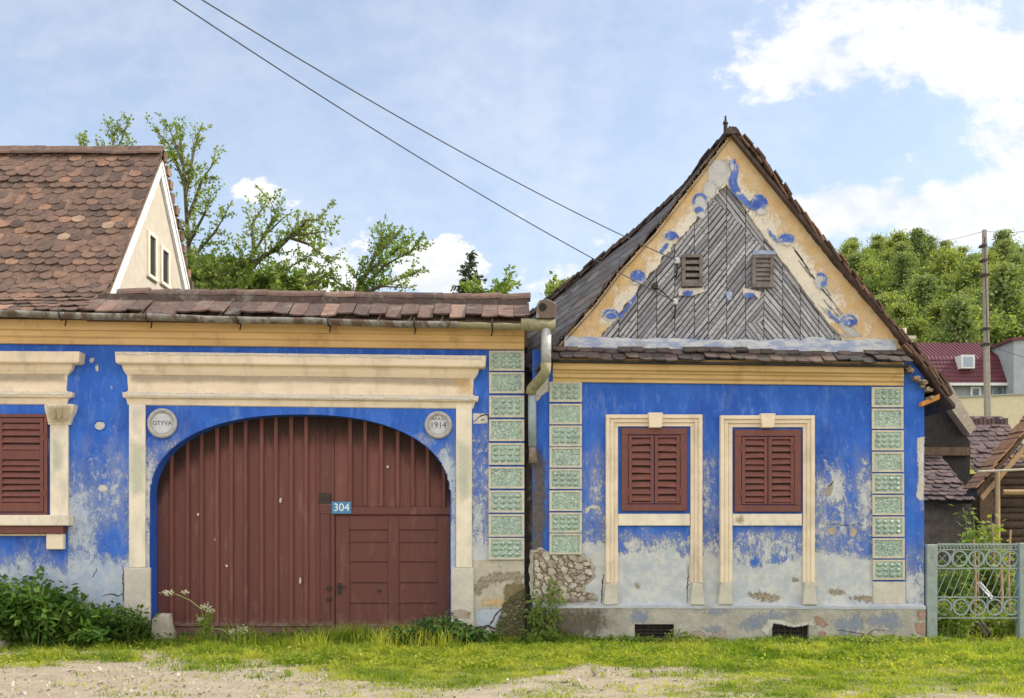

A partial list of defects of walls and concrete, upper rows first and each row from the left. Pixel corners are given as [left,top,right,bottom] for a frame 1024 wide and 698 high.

peeling [0,457,130,616]
flaking render [452,413,524,636]
peeling [582,455,901,639]